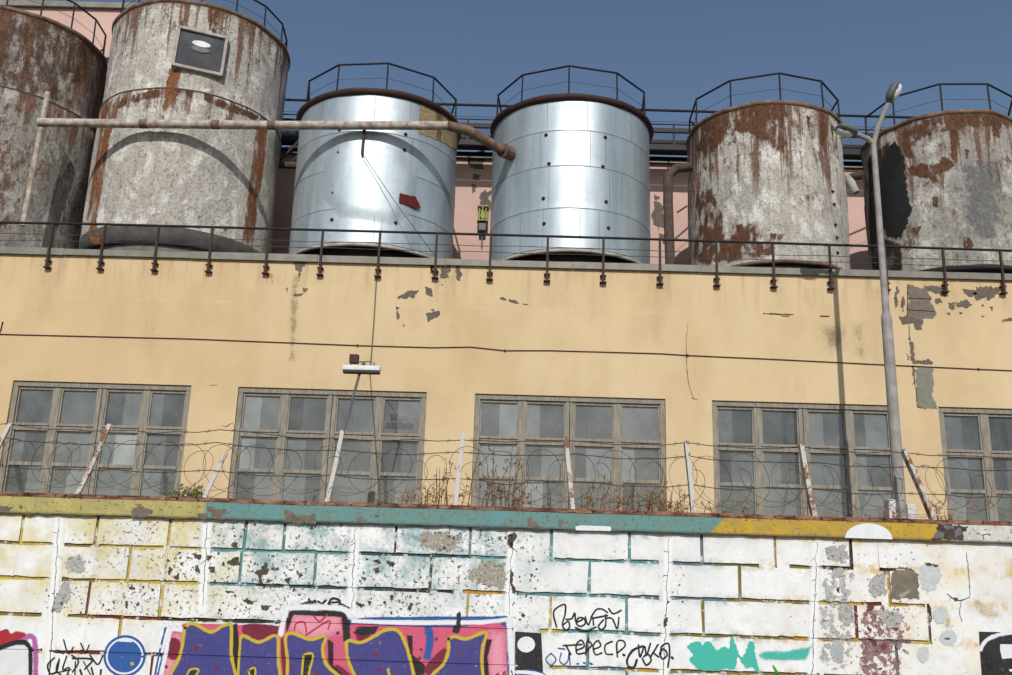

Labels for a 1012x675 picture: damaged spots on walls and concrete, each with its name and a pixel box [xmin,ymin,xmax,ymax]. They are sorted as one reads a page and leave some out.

rust [0,12,92,100]
rust [208,7,219,33]
rust [87,68,268,249]
rust [695,104,788,170]
rust [806,113,834,156]
rust [900,113,1011,184]
rust [694,187,782,266]
rust [867,143,903,271]
flaking render [396,266,463,326]
spalling [894,284,1000,375]
spalling [860,562,943,670]